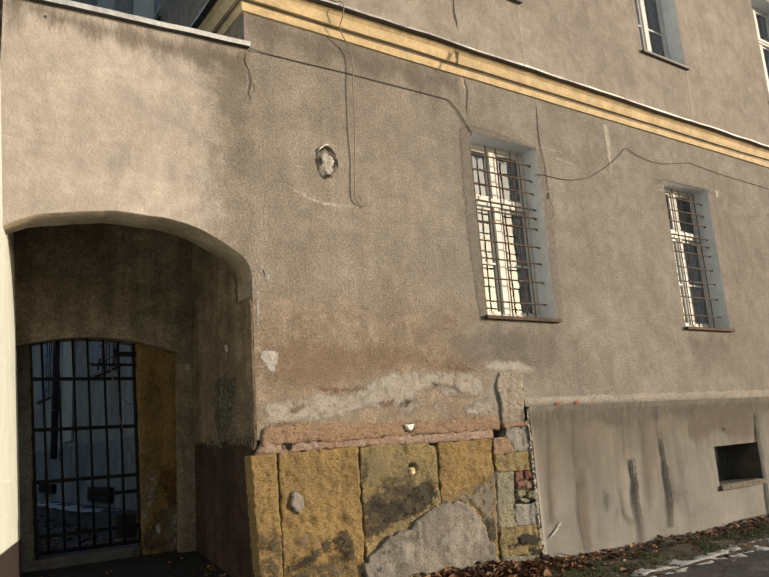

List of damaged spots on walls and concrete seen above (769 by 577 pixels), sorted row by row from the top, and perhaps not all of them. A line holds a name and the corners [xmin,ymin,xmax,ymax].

crack [244,53,255,105]
spalling [316,144,339,180]
crack [536,107,554,218]
peeling [260,349,279,374]
peeling [207,366,494,448]
damp [366,452,439,515]
damp [512,404,699,555]
peeling [485,516,497,542]